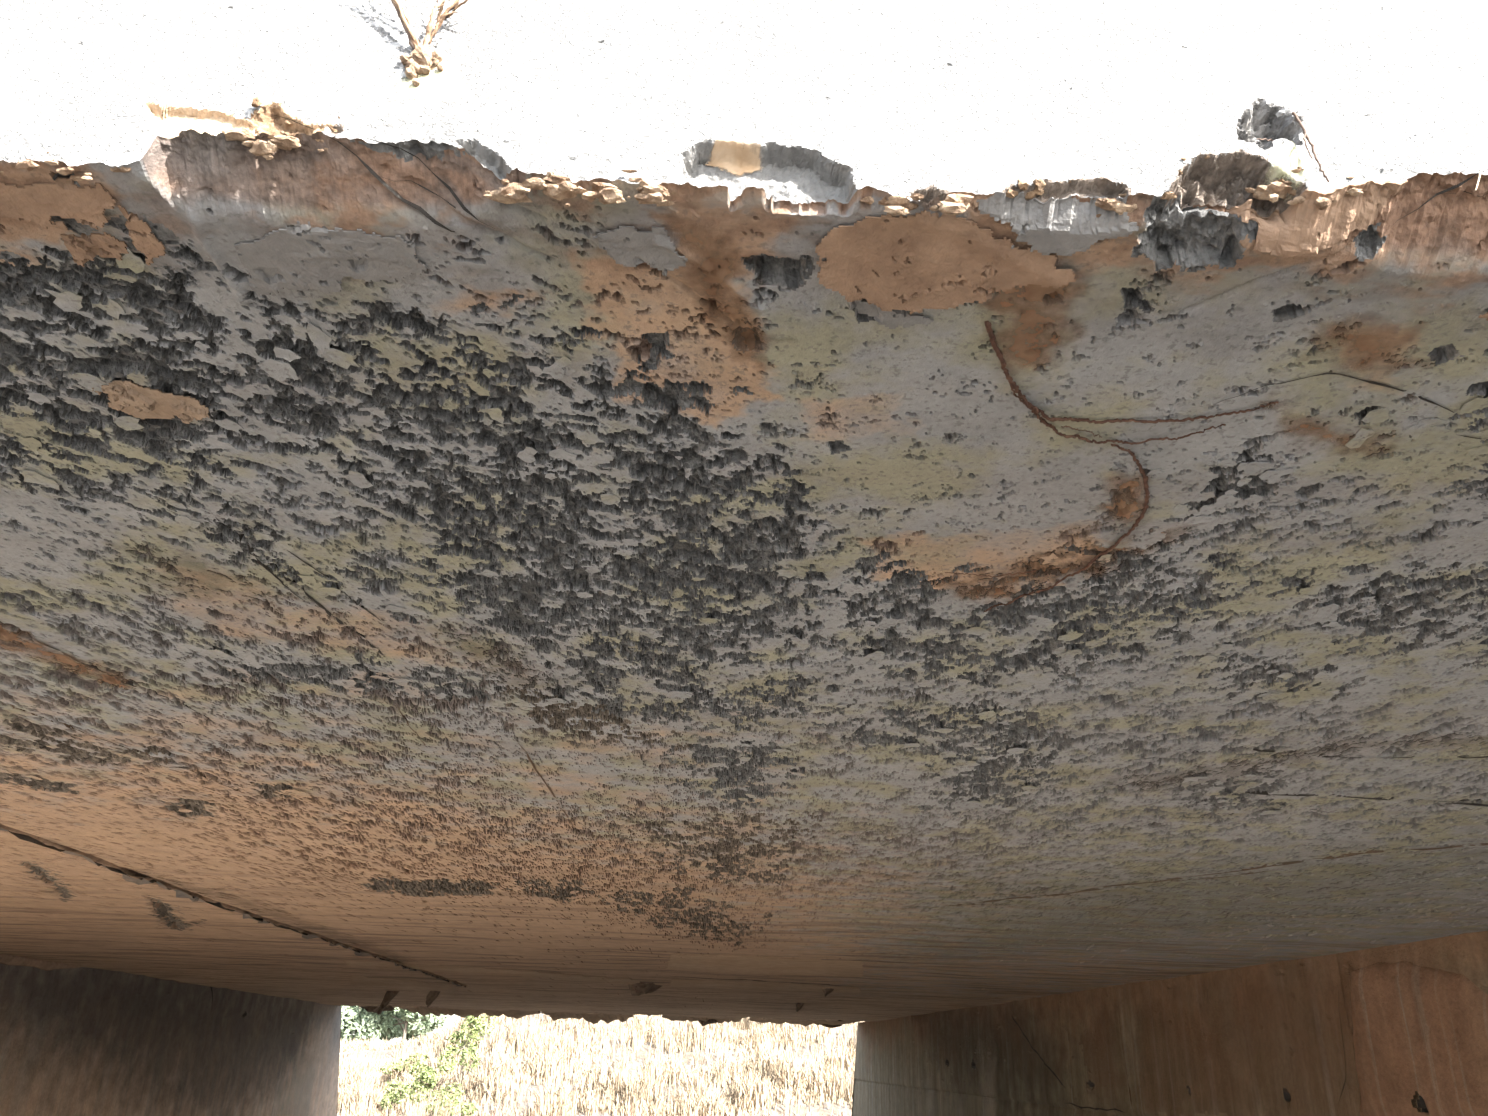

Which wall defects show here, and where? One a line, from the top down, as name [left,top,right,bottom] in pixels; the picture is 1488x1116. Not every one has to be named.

spalling [0,151,93,187]
spalling [144,97,973,216]
spalling [1002,97,1363,272]
peeling [0,214,1488,946]